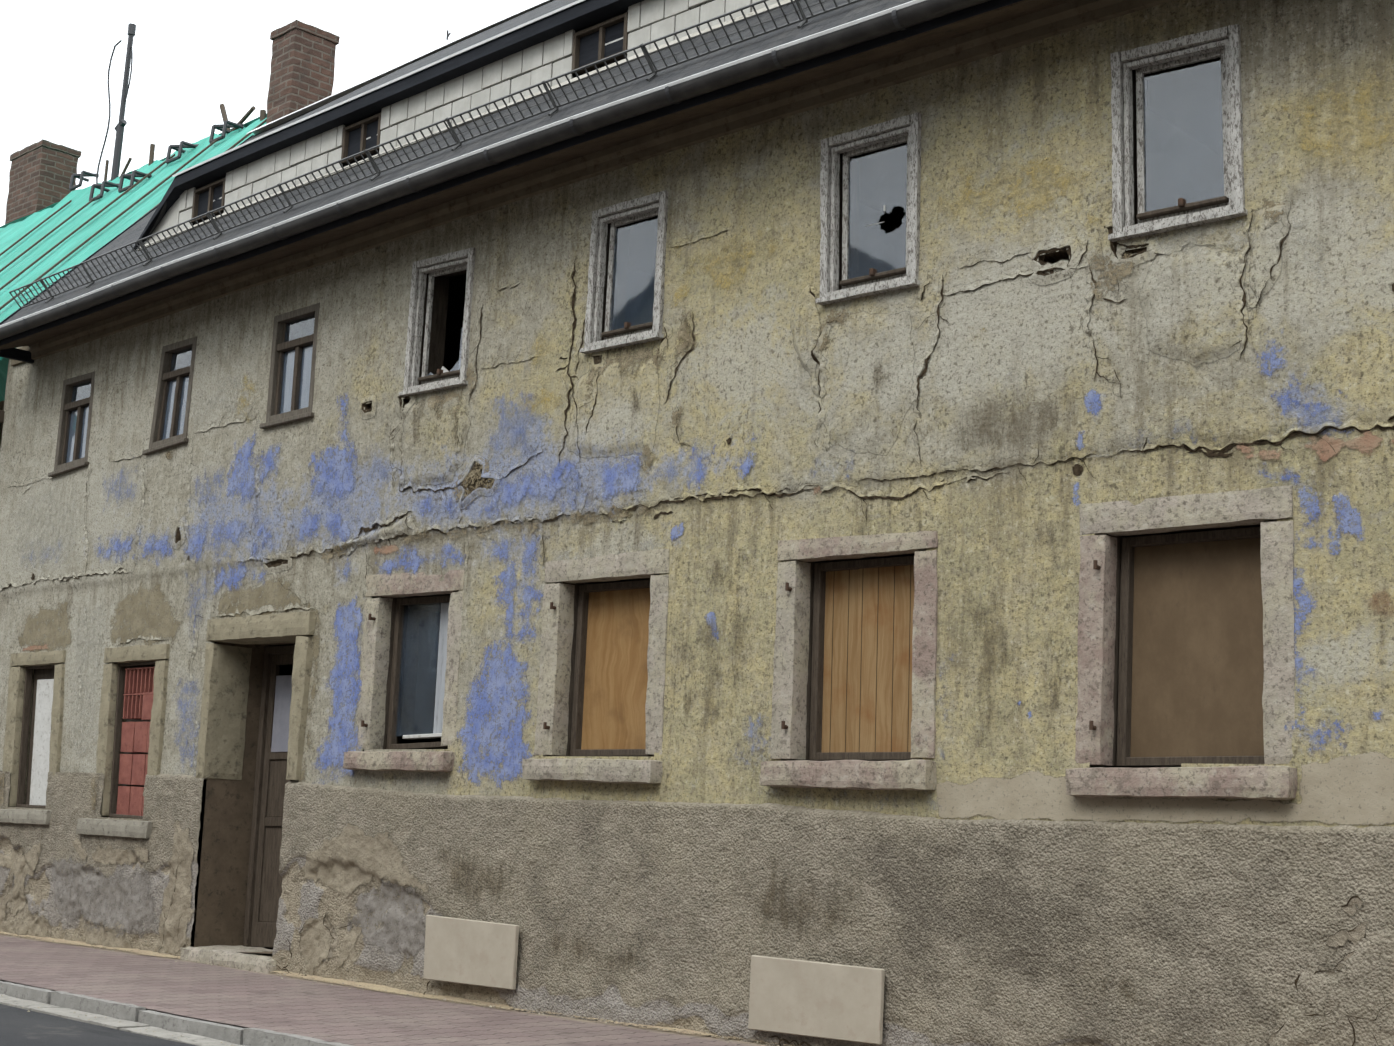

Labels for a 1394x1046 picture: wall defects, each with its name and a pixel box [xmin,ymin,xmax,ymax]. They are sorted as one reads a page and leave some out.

crack [193,206,1394,596]
flaking render [1296,392,1394,462]
crack [0,449,147,591]
crack [116,600,315,693]